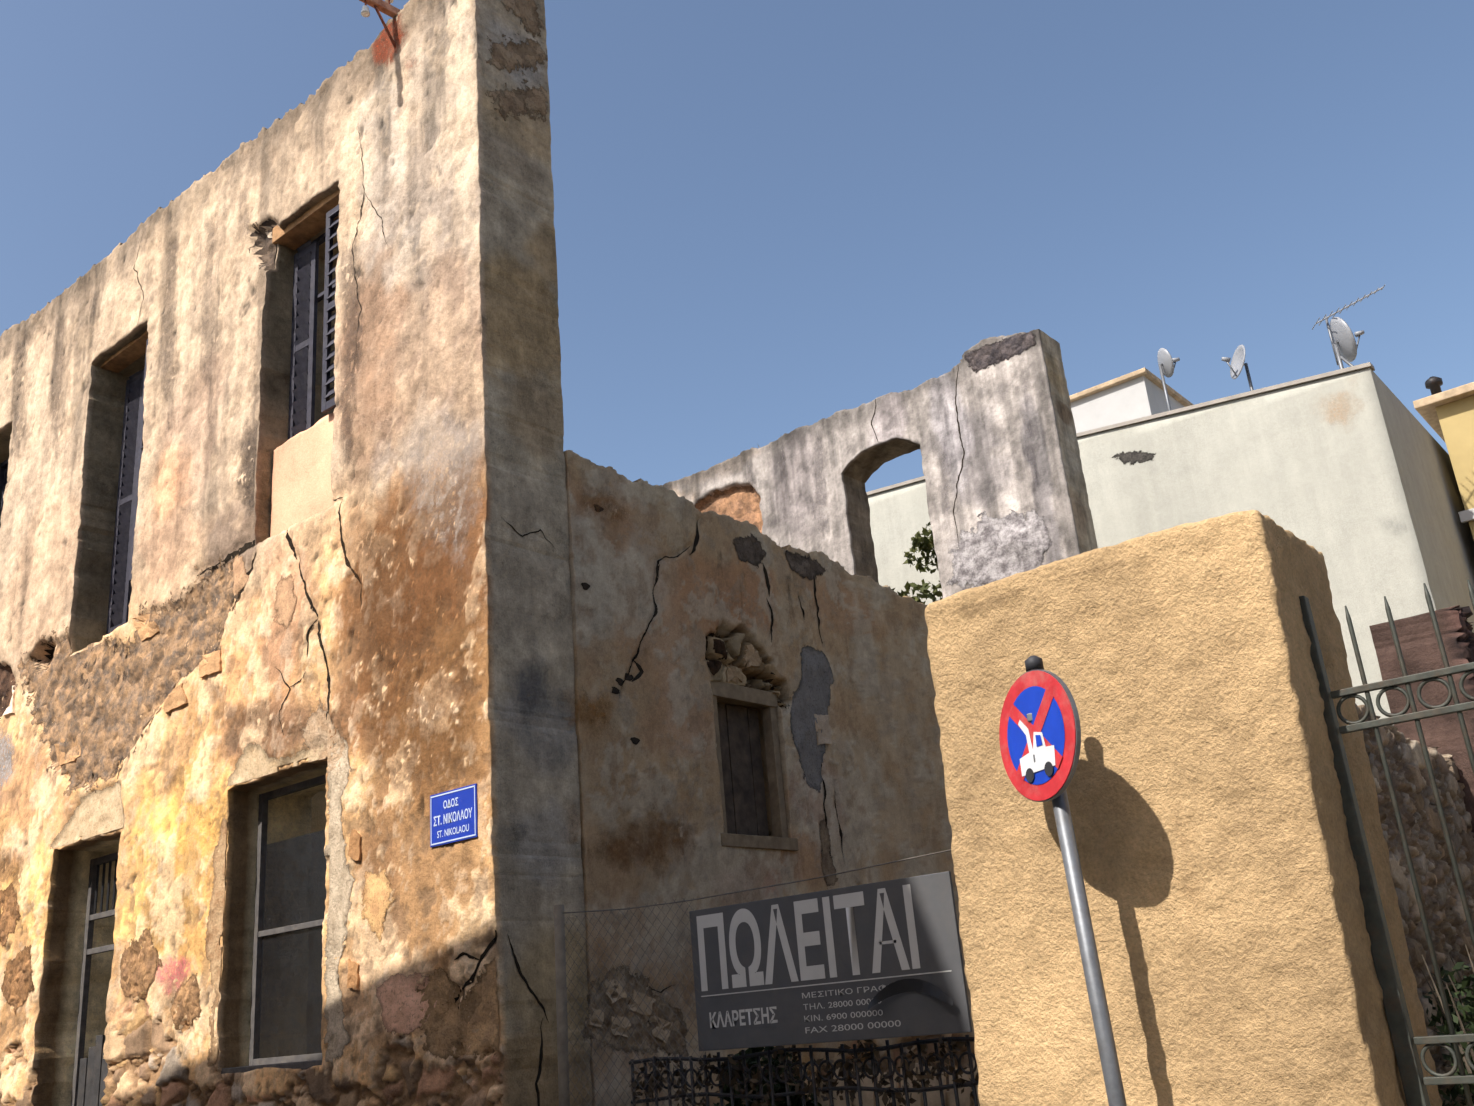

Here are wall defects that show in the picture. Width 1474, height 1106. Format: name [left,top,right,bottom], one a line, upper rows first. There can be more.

corrosion [373,15,403,62]
flaking render [485,0,548,122]
crack [953,368,965,549]
peeling [1112,450,1155,465]
crack [197,530,331,735]
crack [334,497,362,609]
crack [619,520,699,694]
spalling [695,485,767,568]
flaking render [785,550,827,581]
flaking render [705,632,834,793]
crack [454,930,549,1106]
flaking render [582,965,689,1057]